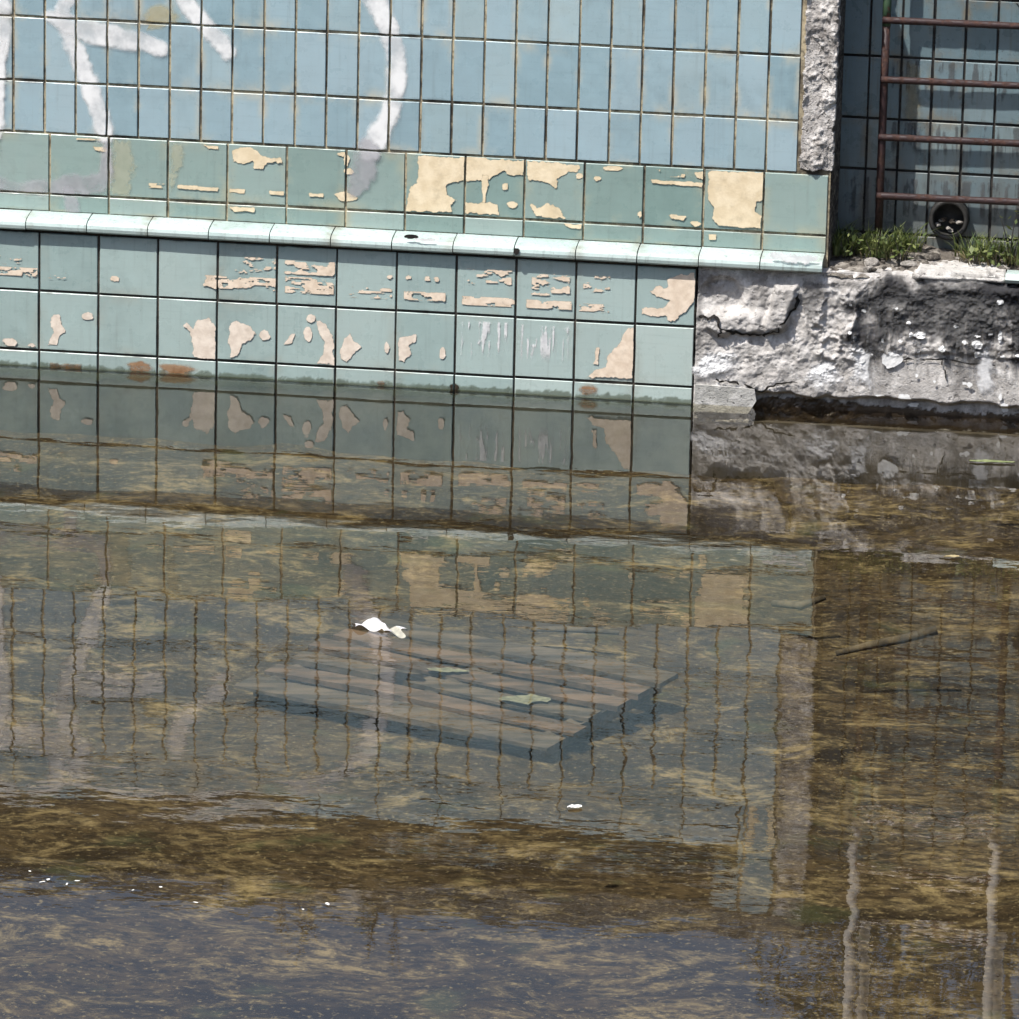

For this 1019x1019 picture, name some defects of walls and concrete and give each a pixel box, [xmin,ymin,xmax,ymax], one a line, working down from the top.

spalling [798,0,841,172]
peeling [406,155,623,215]
peeling [651,169,763,240]
peeling [183,317,216,359]
peeling [203,257,335,295]
peeling [284,314,361,366]
peeling [588,327,634,379]
peeling [642,272,695,322]
water stain [692,352,737,376]
crack [699,293,800,337]
crack [716,378,797,393]
water stain [748,273,1019,434]